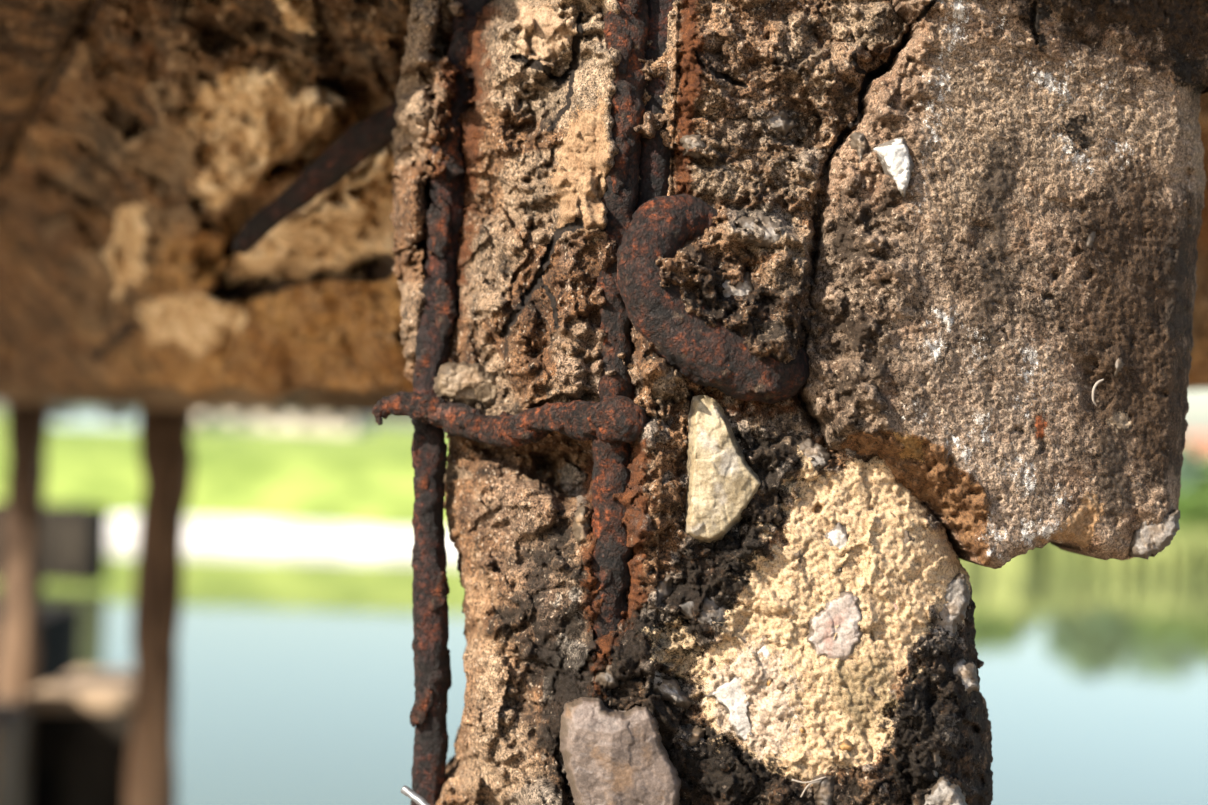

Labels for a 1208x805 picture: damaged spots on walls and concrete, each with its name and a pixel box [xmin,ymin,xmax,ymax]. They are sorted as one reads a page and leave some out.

spalling [181,57,347,211]
crack [185,253,396,304]
spalling [223,141,395,287]
rust [424,6,502,336]
crack [511,11,584,132]
spalling [548,90,619,242]
rust [673,0,709,195]
crack [825,0,941,167]
rust [580,438,655,698]
leakage [494,429,820,805]
spalling [840,430,992,565]
leakage [831,600,992,805]